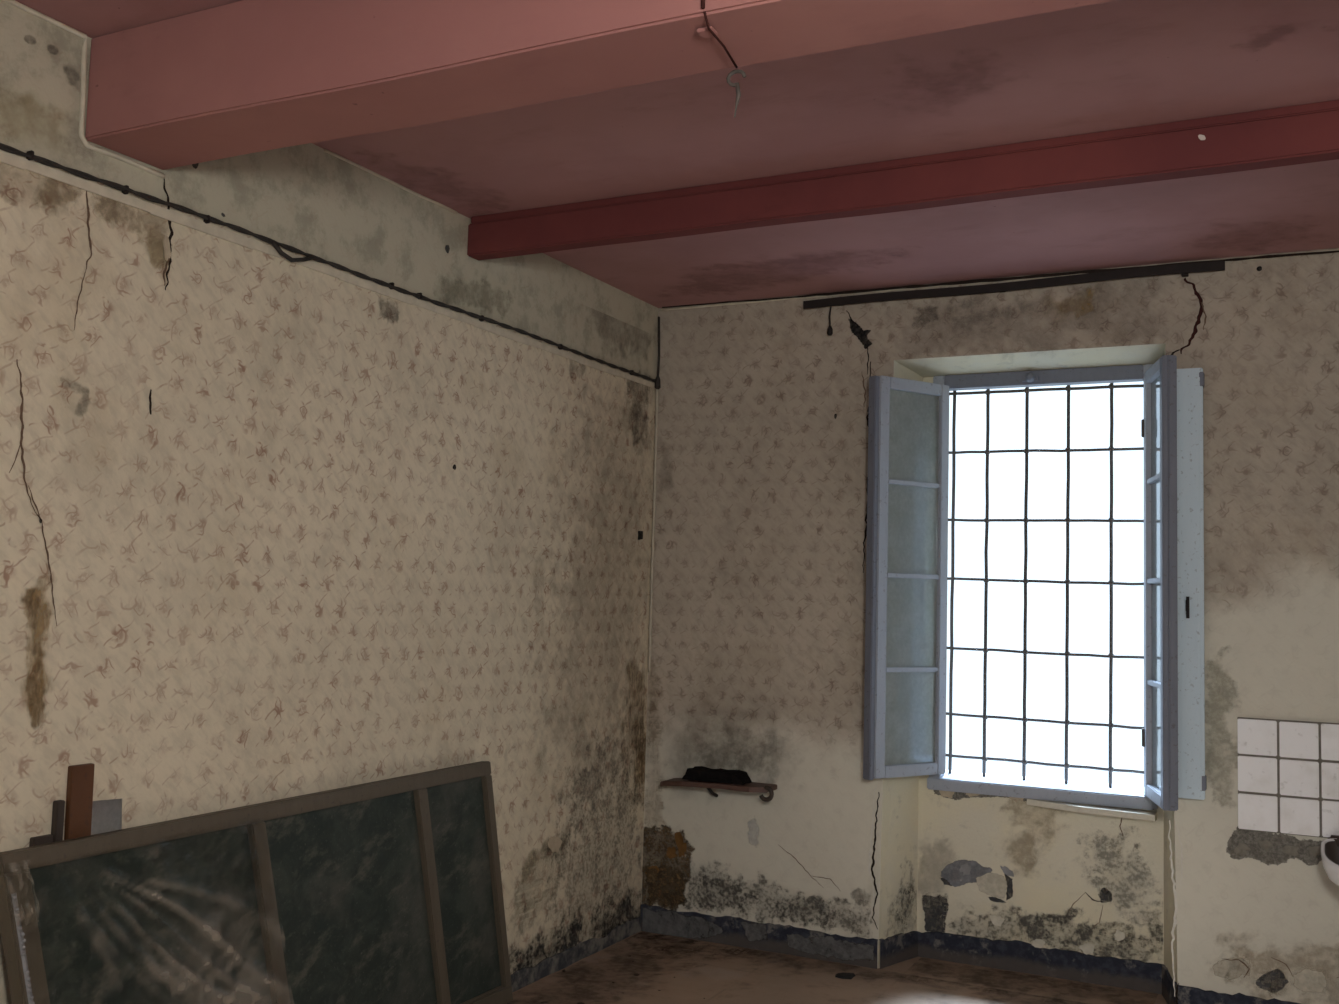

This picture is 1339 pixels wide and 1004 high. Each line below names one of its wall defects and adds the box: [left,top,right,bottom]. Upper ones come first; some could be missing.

crack [74,191,92,330]
crack [662,250,1339,355]
crack [9,359,57,626]
leakage [509,890,641,974]
leakage [686,862,872,935]
crack [780,846,839,889]
crack [868,785,880,929]
flaking render [941,860,1014,903]
leakage [922,895,1163,962]
flaking render [1226,827,1322,866]